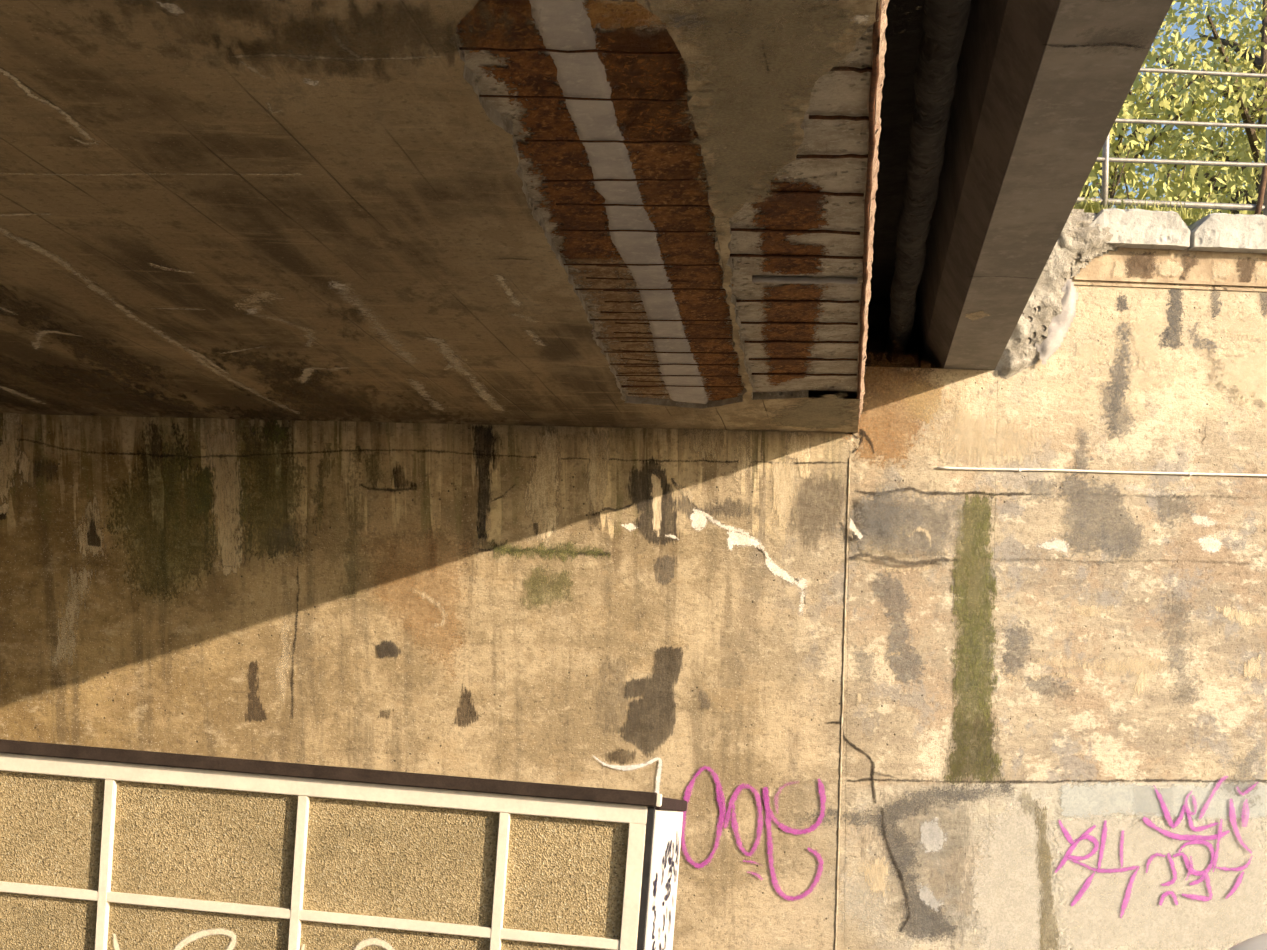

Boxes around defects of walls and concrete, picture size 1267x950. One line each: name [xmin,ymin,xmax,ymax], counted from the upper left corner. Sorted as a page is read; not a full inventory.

crack [1043,42,1141,50]
spalling [452,0,894,425]
water stain [205,430,243,576]
water stain [584,429,811,612]
crack [849,553,957,571]
crack [857,487,1032,496]
water stain [608,646,683,764]